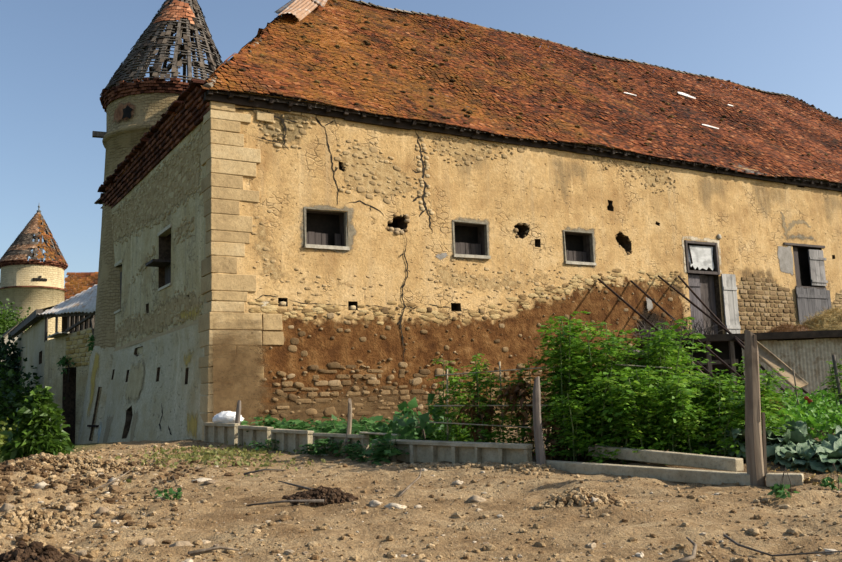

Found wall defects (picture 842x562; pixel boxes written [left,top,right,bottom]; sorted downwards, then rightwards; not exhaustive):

crack [236,108,384,216]
peeling [334,139,419,204]
crack [413,130,434,233]
crack [398,233,417,362]
peeling [248,210,690,427]